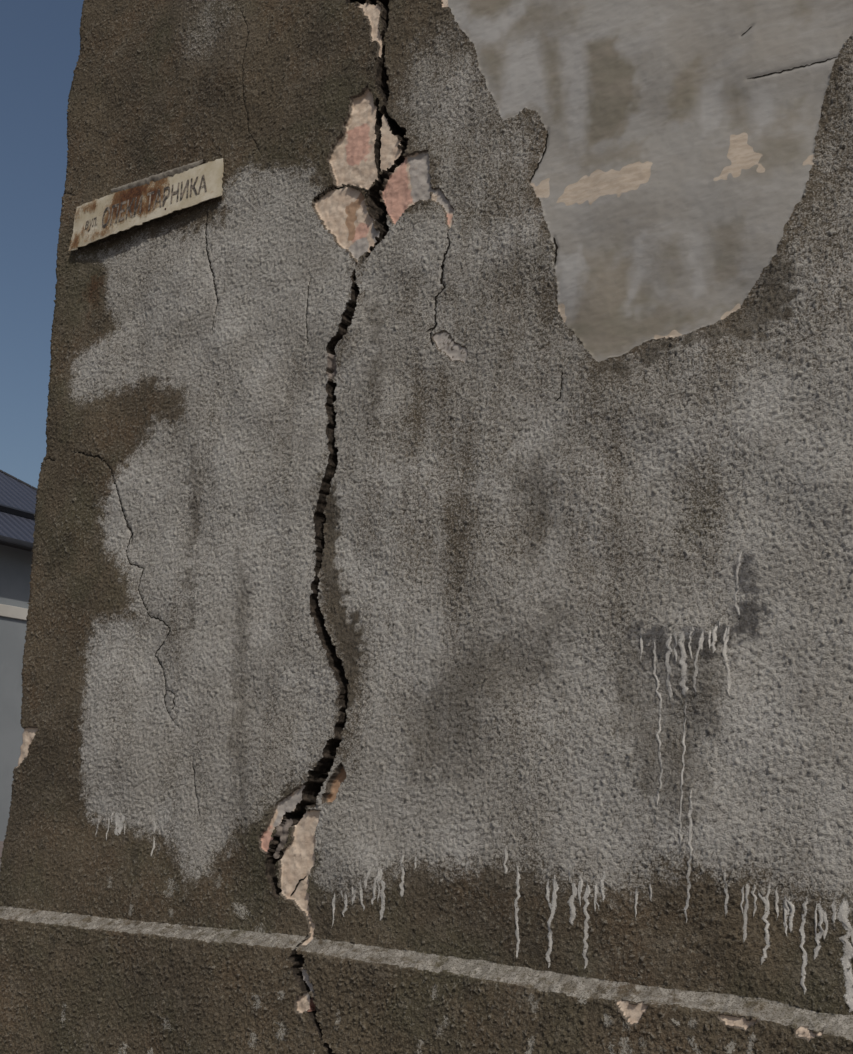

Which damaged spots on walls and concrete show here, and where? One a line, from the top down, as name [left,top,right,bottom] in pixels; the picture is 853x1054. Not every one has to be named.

rust [70,178,169,250]
flaking render [311,84,455,263]
flaking render [432,329,468,363]
crack [265,0,409,899]
crack [45,451,180,729]
flaking render [14,727,38,769]
damp [635,551,748,922]
flaking render [258,762,346,947]
crack [289,936,335,1054]
damp [332,867,386,925]
damp [545,868,606,969]
damp [723,871,853,1012]